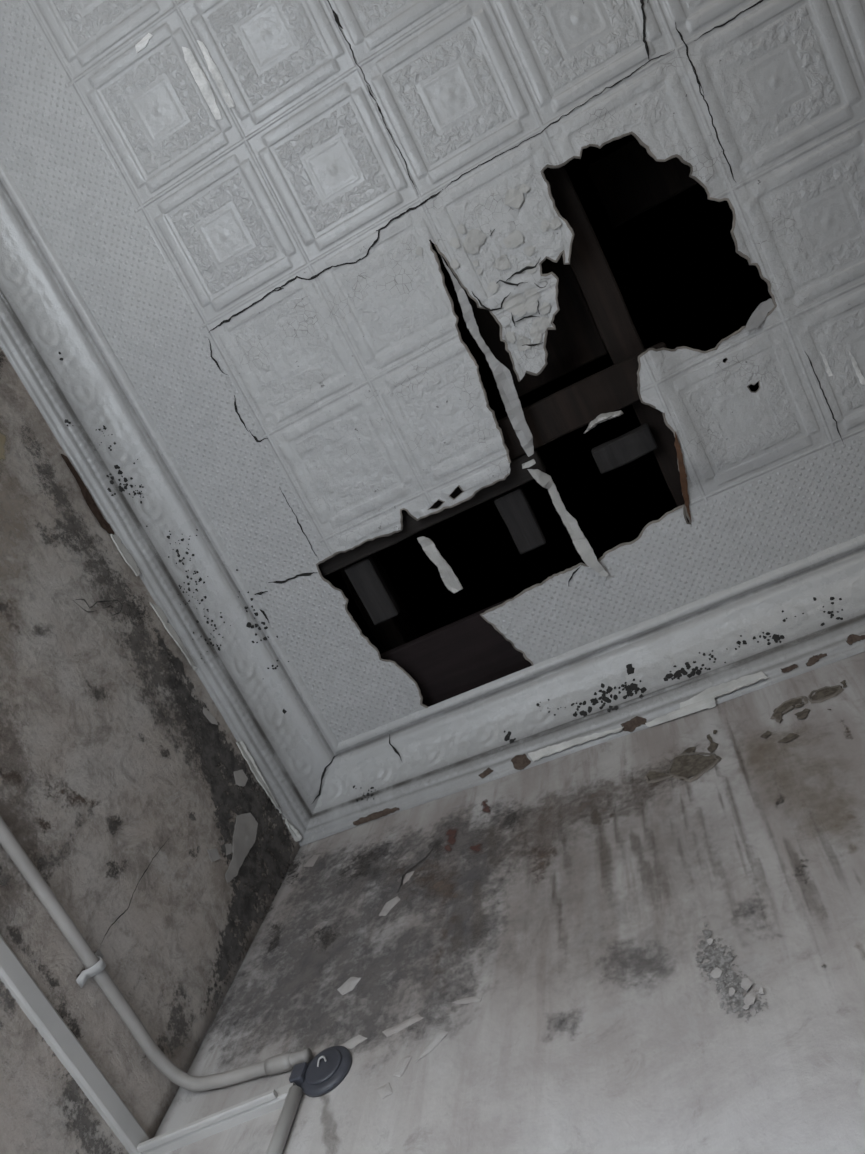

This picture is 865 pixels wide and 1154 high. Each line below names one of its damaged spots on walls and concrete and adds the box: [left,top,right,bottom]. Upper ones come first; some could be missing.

crack [209,0,763,469]
peeling [450,223,552,352]
peeling [744,298,774,330]
peeling [584,410,623,433]
peeling [645,671,768,727]
spalling [760,680,847,743]
water stain [0,426,672,1063]
peeling [528,727,624,762]
water stain [58,1069,123,1154]